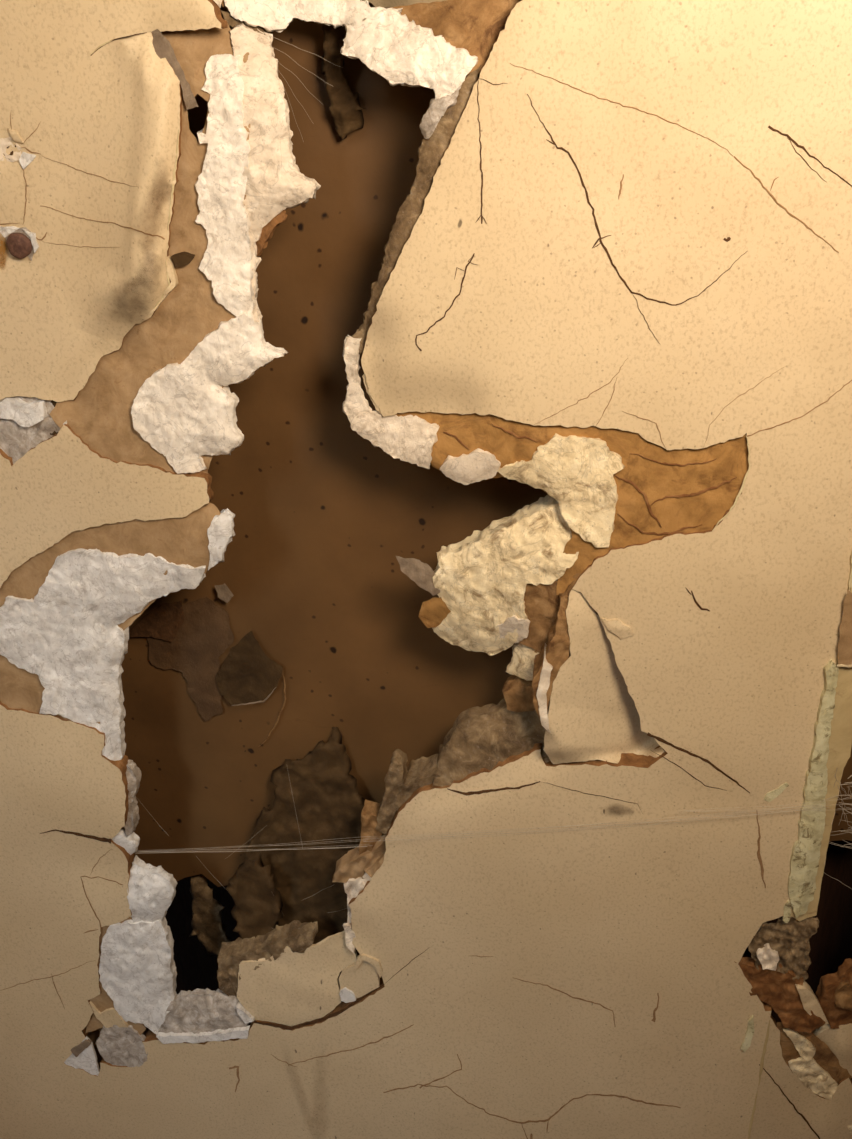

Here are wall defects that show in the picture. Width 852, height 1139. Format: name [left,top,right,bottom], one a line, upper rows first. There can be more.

crack [475,63,839,344]
crack [768,125,852,187]
crack [415,253,477,351]
crack [536,358,665,447]
crack [747,380,852,437]
spalling [342,335,750,595]
spalling [0,0,579,1067]
spalling [829,746,852,842]
peeling [64,1036,100,1076]
crack [383,1054,681,1139]
spalling [740,1015,852,1139]